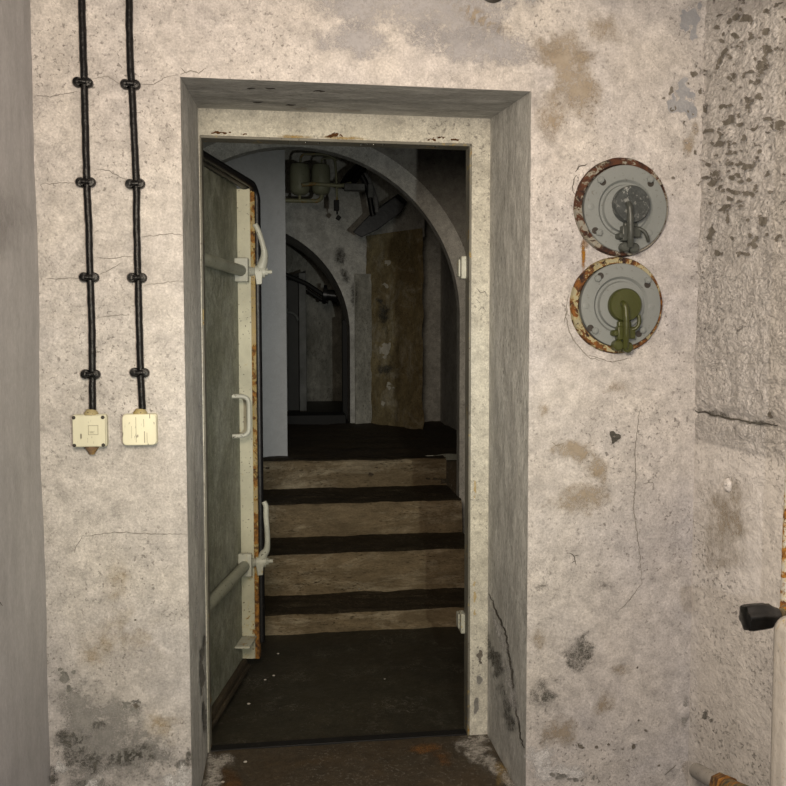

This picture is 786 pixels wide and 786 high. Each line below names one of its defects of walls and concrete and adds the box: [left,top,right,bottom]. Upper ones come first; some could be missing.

damp [317,0,526,63]
damp [540,36,598,129]
peeling [662,0,786,224]
peeling [705,220,723,256]
peeling [735,215,782,257]
crack [695,410,778,426]
damp [552,441,606,479]
crack [619,412,654,610]
crack [489,594,525,748]
damp [565,635,593,671]
damp [49,681,191,786]